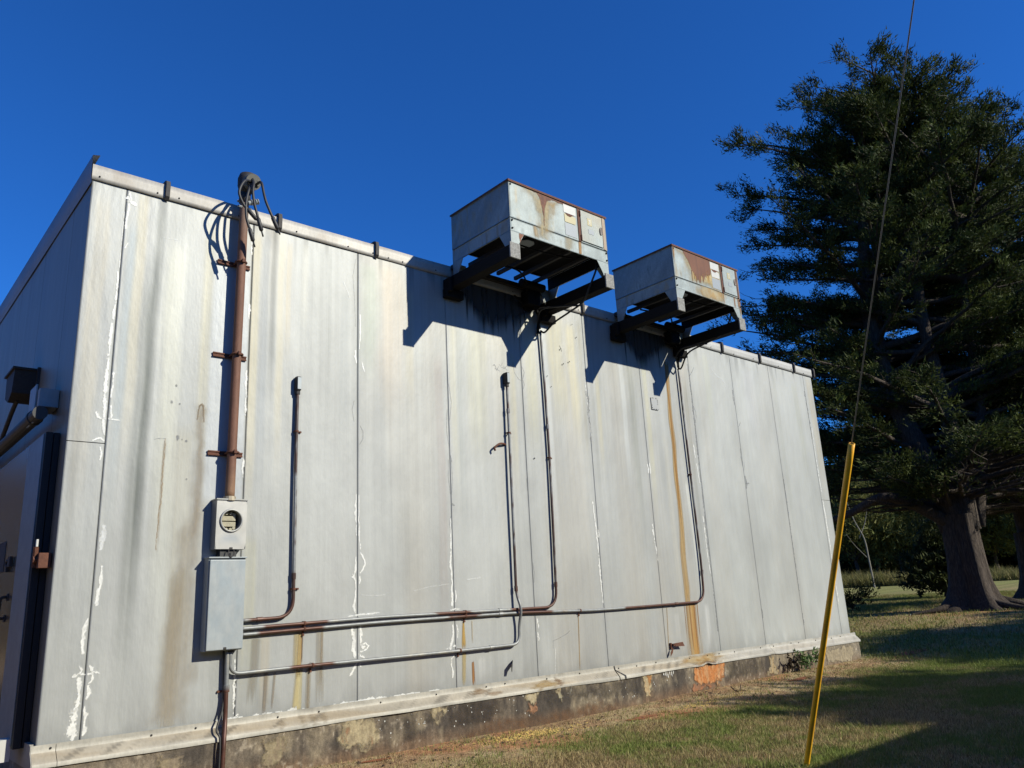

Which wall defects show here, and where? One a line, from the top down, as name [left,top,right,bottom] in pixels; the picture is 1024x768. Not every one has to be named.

corrosion [519,190,583,254]
corrosion [672,246,741,313]
corrosion [665,364,725,692]
corrosion [293,632,323,710]